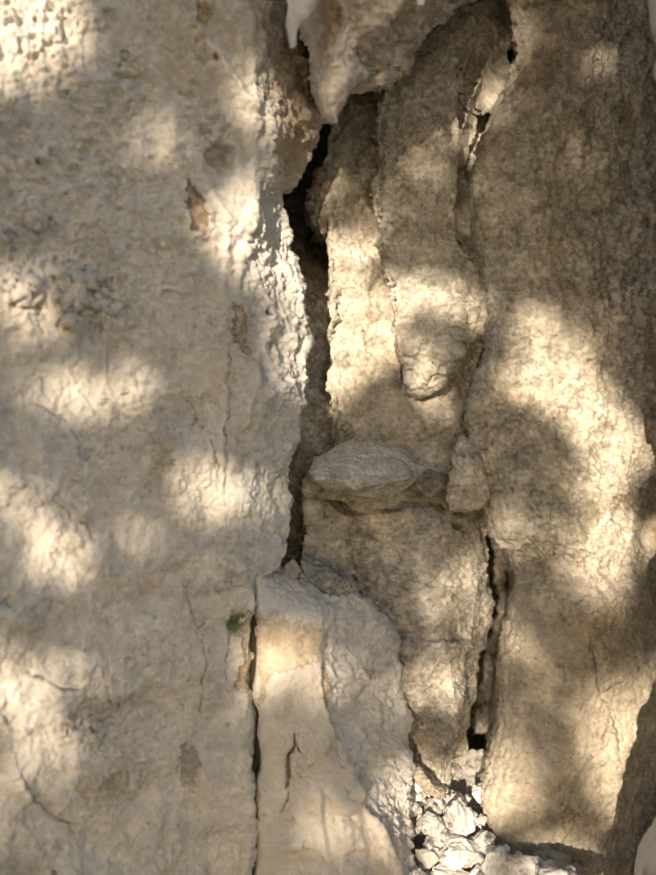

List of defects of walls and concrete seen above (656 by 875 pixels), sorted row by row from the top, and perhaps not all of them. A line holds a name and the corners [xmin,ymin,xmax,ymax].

spalling [186,184,210,235]
spalling [232,302,252,355]
crack [249,614,260,775]